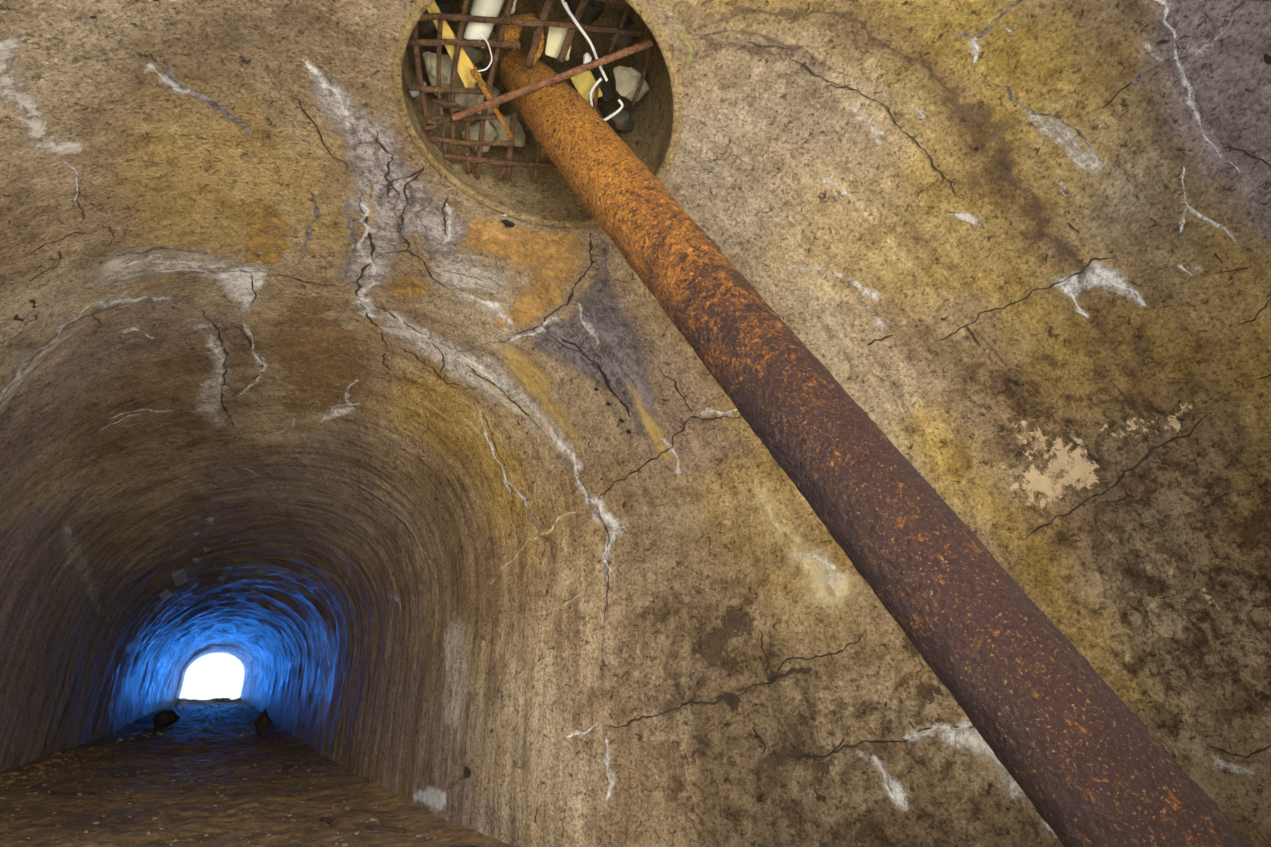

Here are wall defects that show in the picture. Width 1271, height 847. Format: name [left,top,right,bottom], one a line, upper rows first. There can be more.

crack [1101,0,1271,171]
leakage [98,246,267,310]
leakage [303,59,512,326]
rust [468,217,586,326]
crack [1180,166,1248,273]
crack [0,97,864,801]
leakage [376,312,564,451]
rust [628,389,681,473]
crack [934,223,1110,443]
flaking render [1004,411,1099,509]
flaking render [1099,402,1193,448]
leakage [929,728,1024,798]